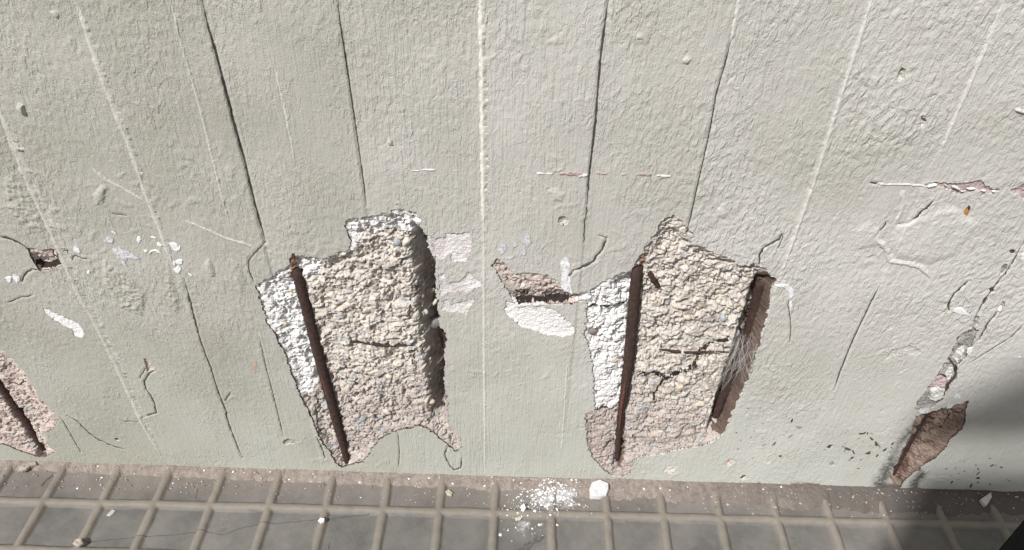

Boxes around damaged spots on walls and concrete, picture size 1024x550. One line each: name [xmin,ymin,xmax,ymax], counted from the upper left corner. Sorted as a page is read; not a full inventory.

crack [202,1,266,282]
crack [338,3,366,202]
crack [569,4,608,276]
crack [686,41,731,233]
spalling [0,347,59,472]
spalling [28,246,80,270]
crack [184,279,243,458]
crack [259,339,284,437]
spalling [256,209,482,466]
spalling [491,215,803,476]
spalling [817,307,978,486]